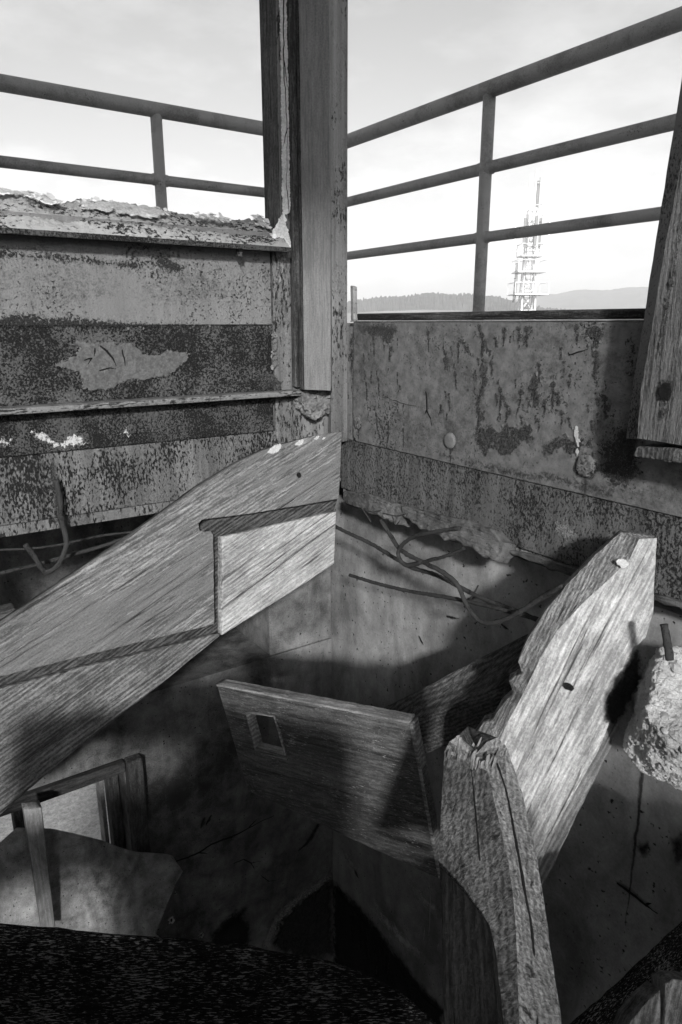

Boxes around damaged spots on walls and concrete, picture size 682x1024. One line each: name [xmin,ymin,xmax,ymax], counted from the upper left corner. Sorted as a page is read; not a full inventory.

peeling [0,187,62,204]
peeling [75,196,173,218]
peeling [193,211,230,223]
peeling [0,310,211,391]
spalling [292,392,343,421]
rust [350,321,405,447]
rust [483,322,644,500]
crack [617,773,658,925]